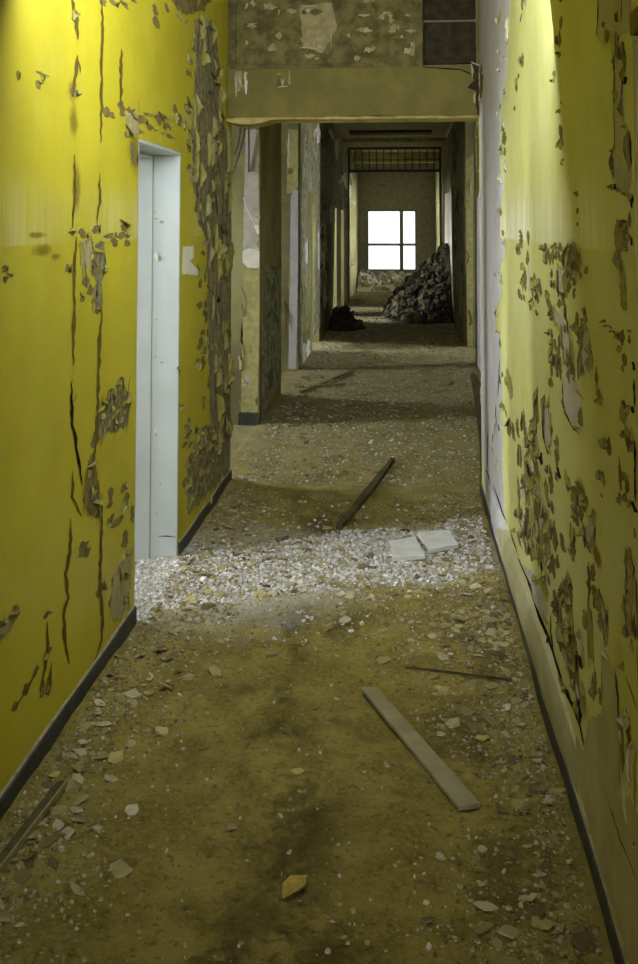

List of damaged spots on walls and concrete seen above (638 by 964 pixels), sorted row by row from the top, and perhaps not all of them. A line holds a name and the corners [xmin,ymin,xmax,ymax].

flaking render [245,0,638,964]